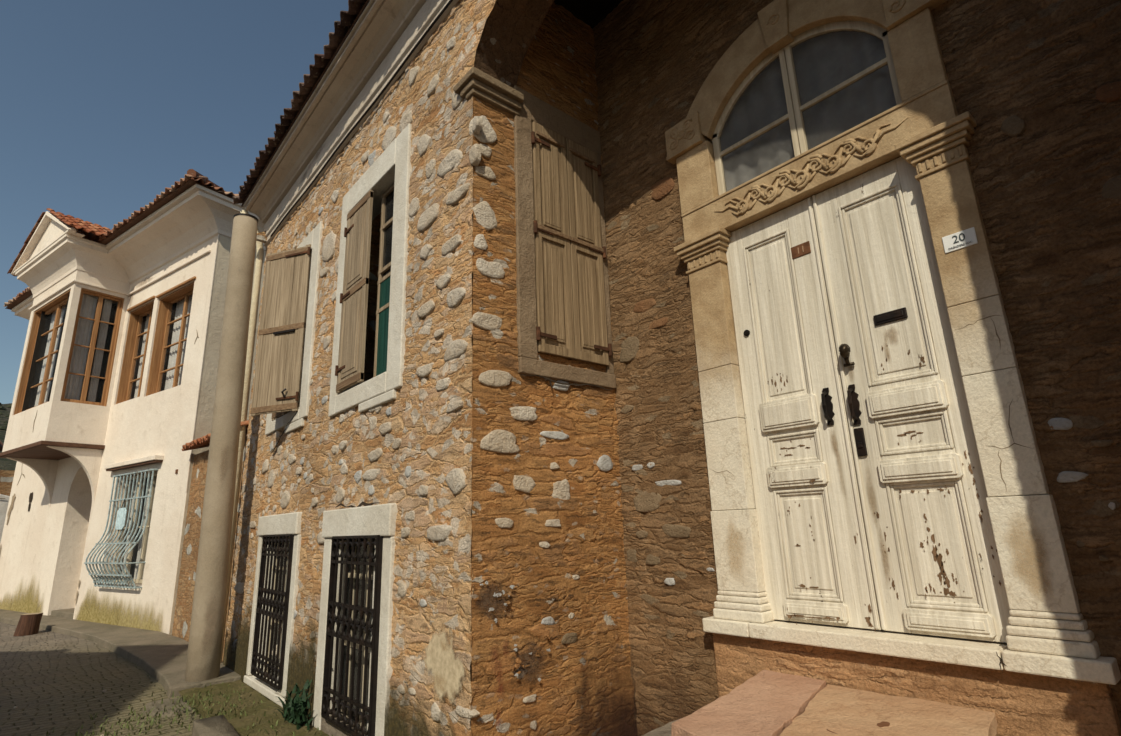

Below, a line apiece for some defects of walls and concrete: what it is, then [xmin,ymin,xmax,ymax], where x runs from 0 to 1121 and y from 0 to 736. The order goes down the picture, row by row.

crack [961,315,1001,348]
crack [991,401,1030,492]
peeling [899,485,964,603]